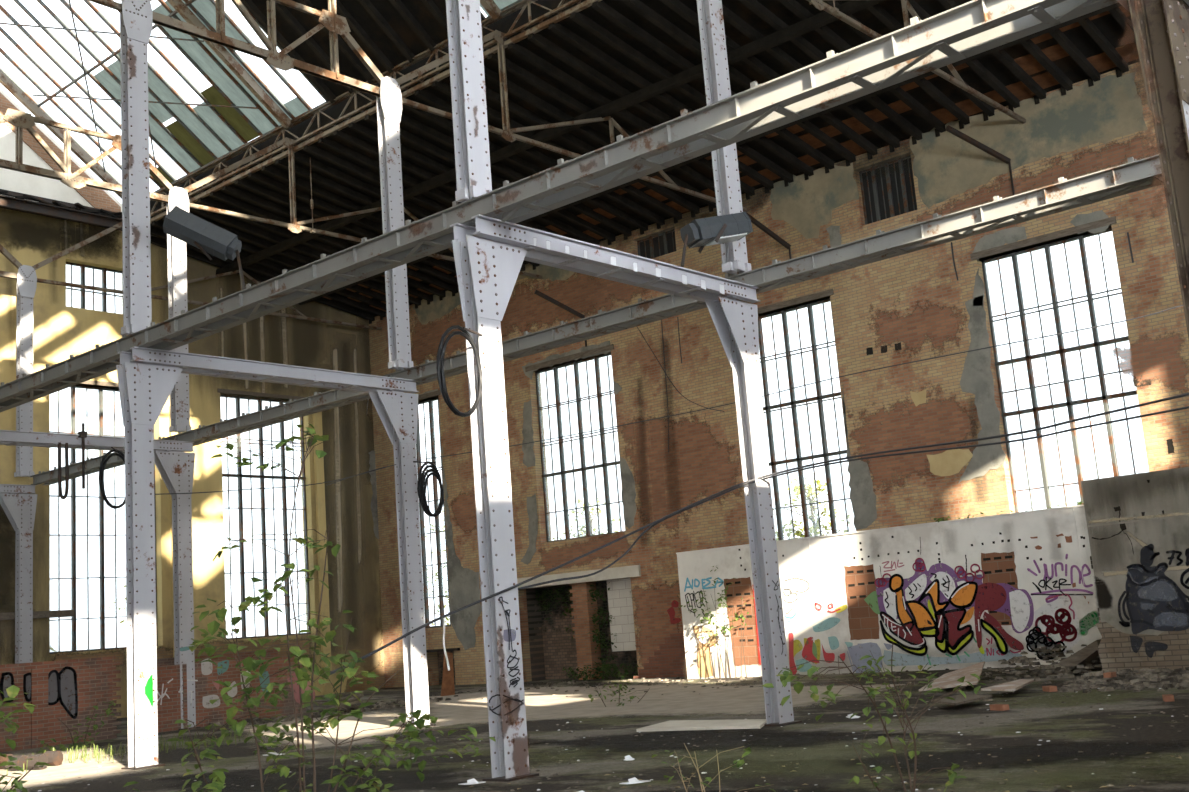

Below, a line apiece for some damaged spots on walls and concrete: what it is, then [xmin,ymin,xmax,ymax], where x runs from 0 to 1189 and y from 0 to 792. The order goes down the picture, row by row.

peeling [770,162,860,247]
peeling [1070,210,1109,234]
spalling [843,226,1027,530]
corrosion [498,626,530,777]